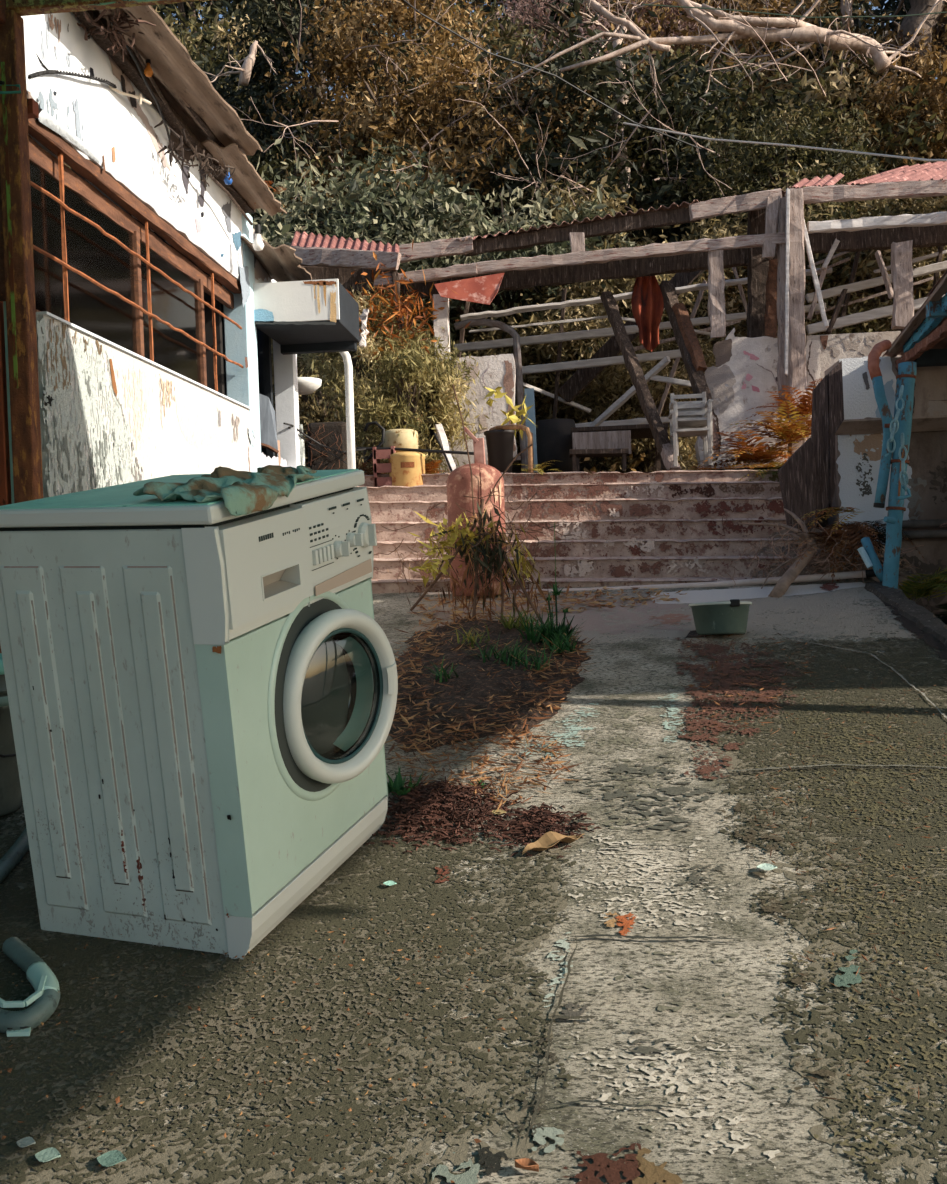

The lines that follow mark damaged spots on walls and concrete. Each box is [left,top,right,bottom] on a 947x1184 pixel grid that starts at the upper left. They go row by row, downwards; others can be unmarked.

peeling [555,520,655,577]
peeling [404,584,924,644]